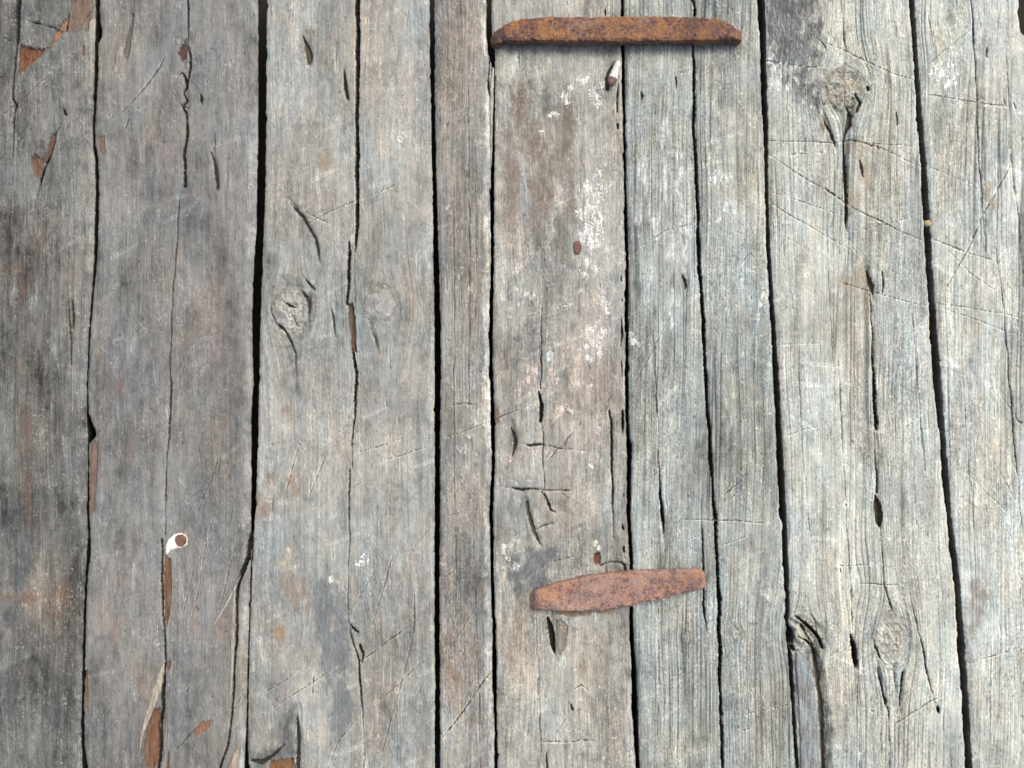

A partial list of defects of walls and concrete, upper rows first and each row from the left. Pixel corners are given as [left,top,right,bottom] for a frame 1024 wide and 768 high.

crack [158,0,192,768]
crack [346,0,378,767]
crack [690,44,724,768]
crack [823,94,862,228]
crack [869,299,879,493]